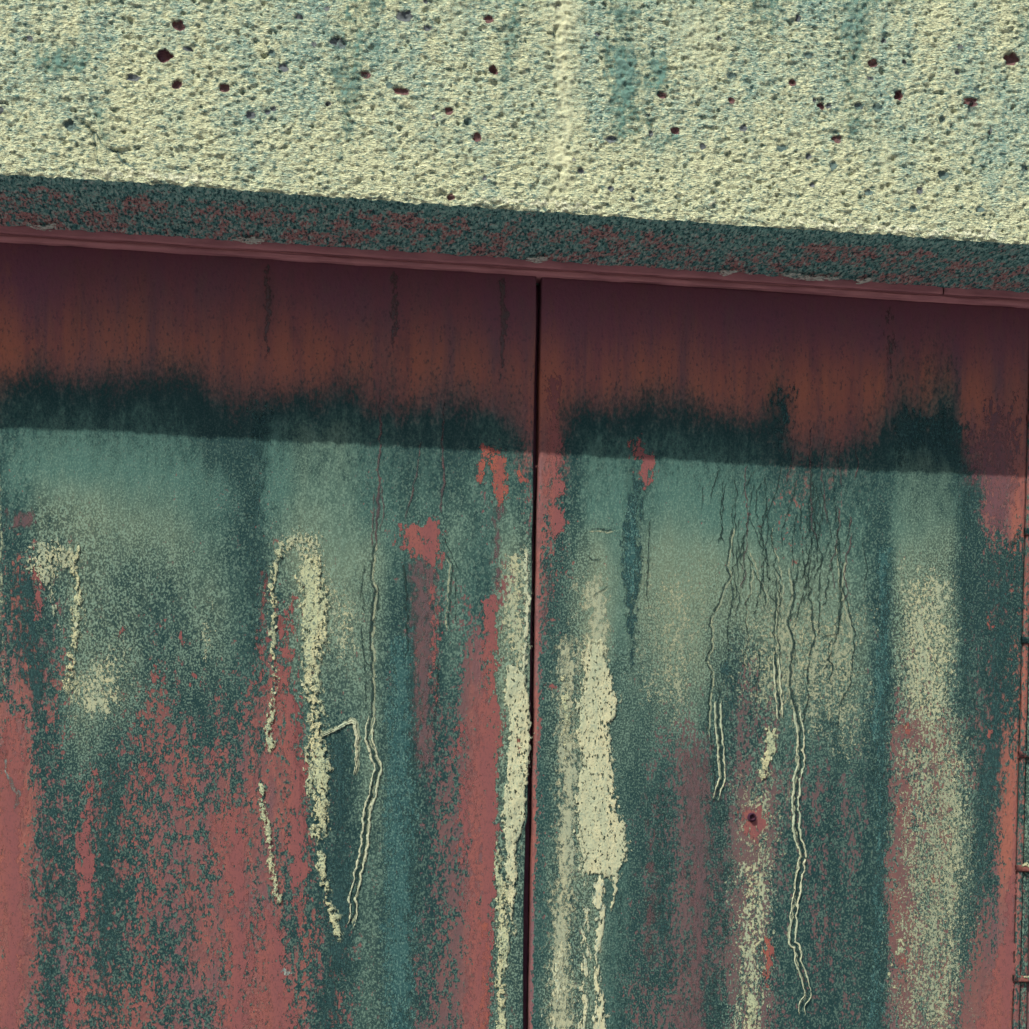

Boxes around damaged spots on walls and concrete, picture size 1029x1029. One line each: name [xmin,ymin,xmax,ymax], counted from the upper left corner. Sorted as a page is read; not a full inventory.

damp [545,0,577,188]
damp [602,3,679,146]